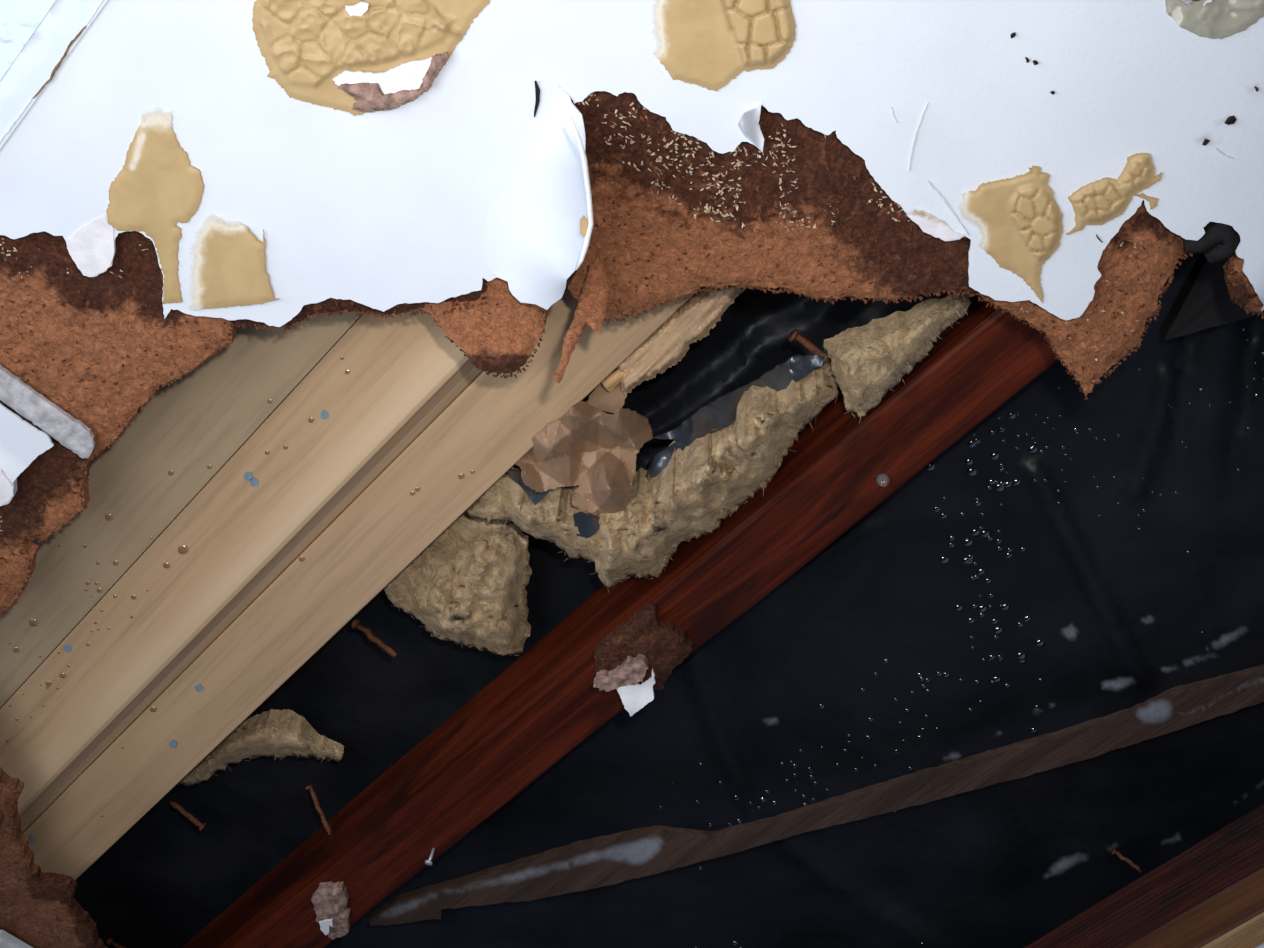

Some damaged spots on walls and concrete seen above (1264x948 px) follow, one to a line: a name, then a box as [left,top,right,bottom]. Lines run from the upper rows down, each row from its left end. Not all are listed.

spalling [0,79,1264,616]
peeling [593,654,655,716]
spalling [0,767,108,948]
peeling [319,918,333,935]